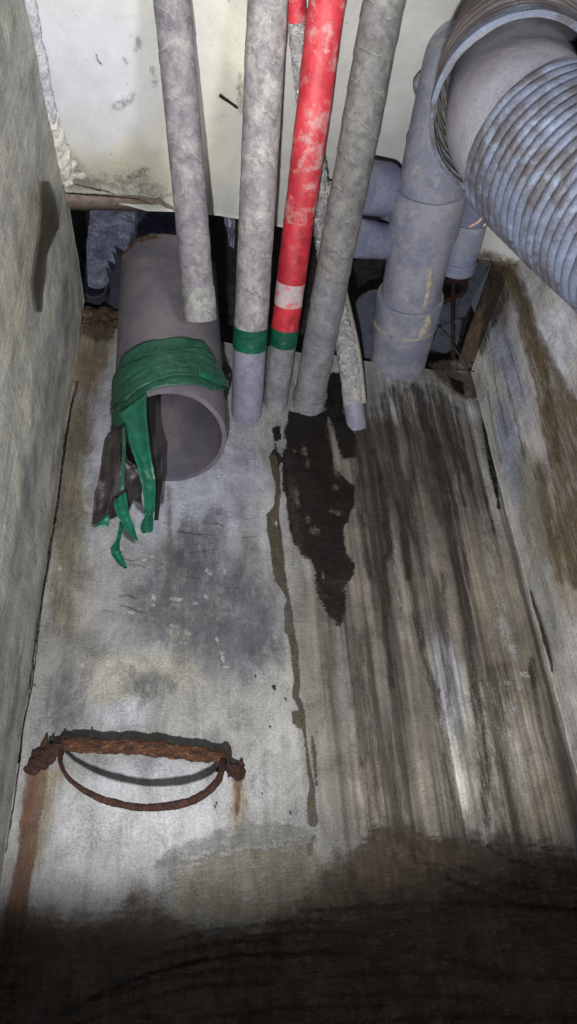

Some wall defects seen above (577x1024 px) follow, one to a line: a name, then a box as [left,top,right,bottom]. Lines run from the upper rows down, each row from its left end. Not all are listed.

leakage [24,0,86,313]
leakage [478,272,509,354]
leakage [0,371,577,1024]
corrosion [3,768,62,932]
corrosion [231,779,247,827]